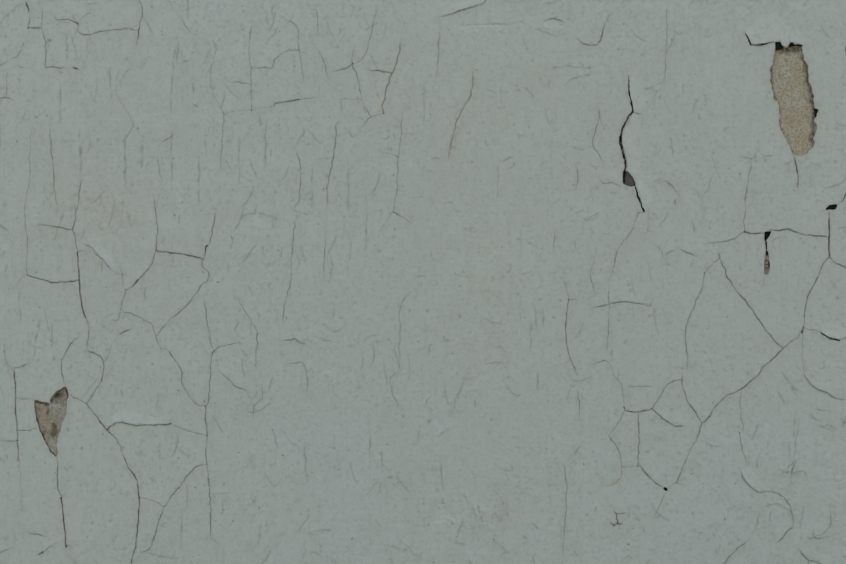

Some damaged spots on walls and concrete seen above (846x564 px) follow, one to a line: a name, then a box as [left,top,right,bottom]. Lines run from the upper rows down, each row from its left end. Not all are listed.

spalling [746,11,818,156]
crack [619,75,645,212]
crack [753,221,830,256]
crack [30,252,86,318]
spalling [34,387,69,457]